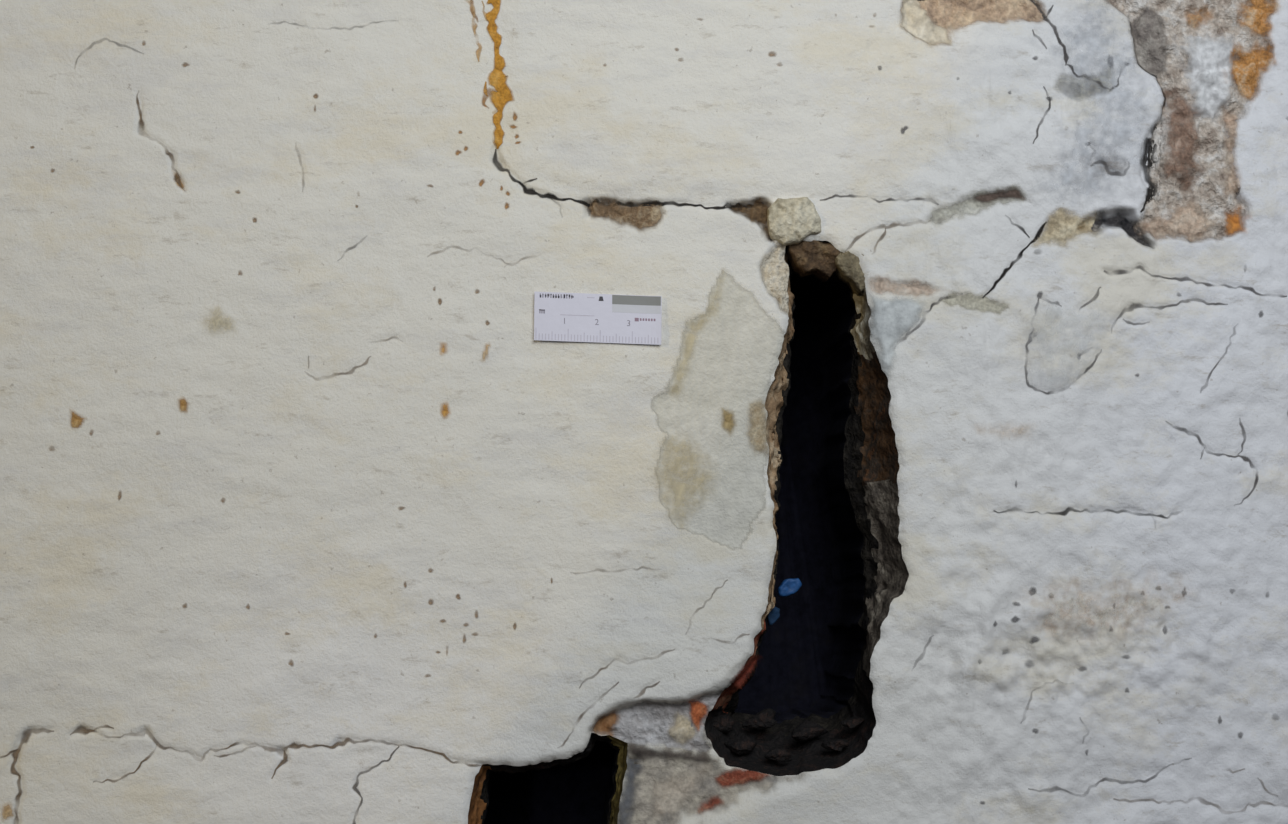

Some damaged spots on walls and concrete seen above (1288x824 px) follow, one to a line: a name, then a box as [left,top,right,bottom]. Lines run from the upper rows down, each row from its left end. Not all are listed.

spalling [901,0,1044,45]
crack [166,150,182,187]
corrosion [470,0,520,149]
crack [493,149,751,210]
crack [821,194,921,242]
crack [1030,0,1166,212]
spalling [1034,0,1277,248]
crack [1025,266,1287,394]
spalling [468,197,1008,824]
crack [4,725,114,819]
crack [102,738,169,783]
crack [271,738,477,824]